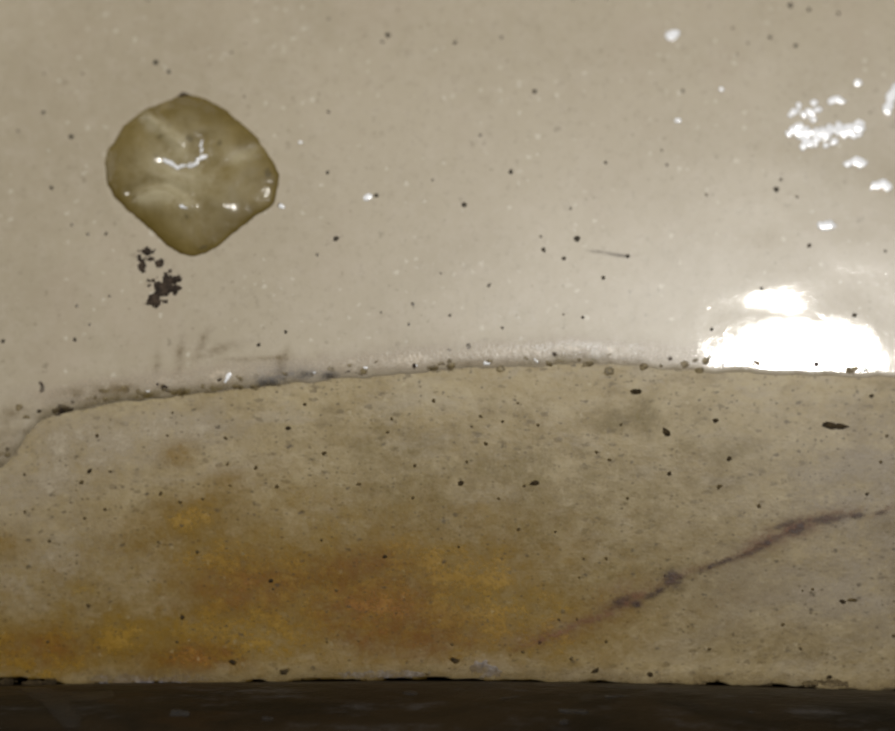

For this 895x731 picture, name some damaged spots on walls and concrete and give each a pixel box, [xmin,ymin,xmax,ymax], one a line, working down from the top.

spalling [822,421,850,430]
peeling [91,673,209,684]
peeling [338,670,431,679]
peeling [802,675,849,687]